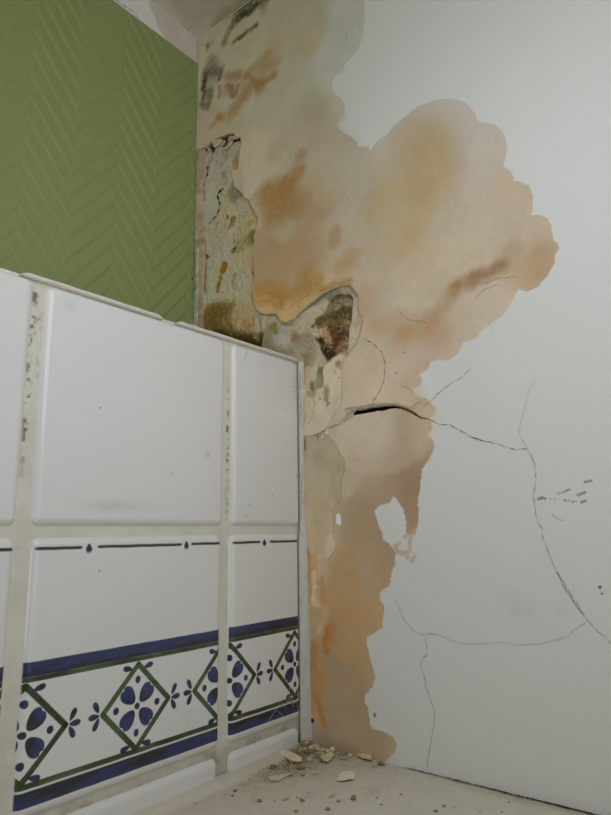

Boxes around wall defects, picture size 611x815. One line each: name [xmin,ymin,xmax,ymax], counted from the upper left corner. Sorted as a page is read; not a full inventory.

spalling [193,133,363,436]
damp [147,0,562,372]
damp [309,468,424,763]
crack [303,339,611,767]
crack [543,801,599,815]